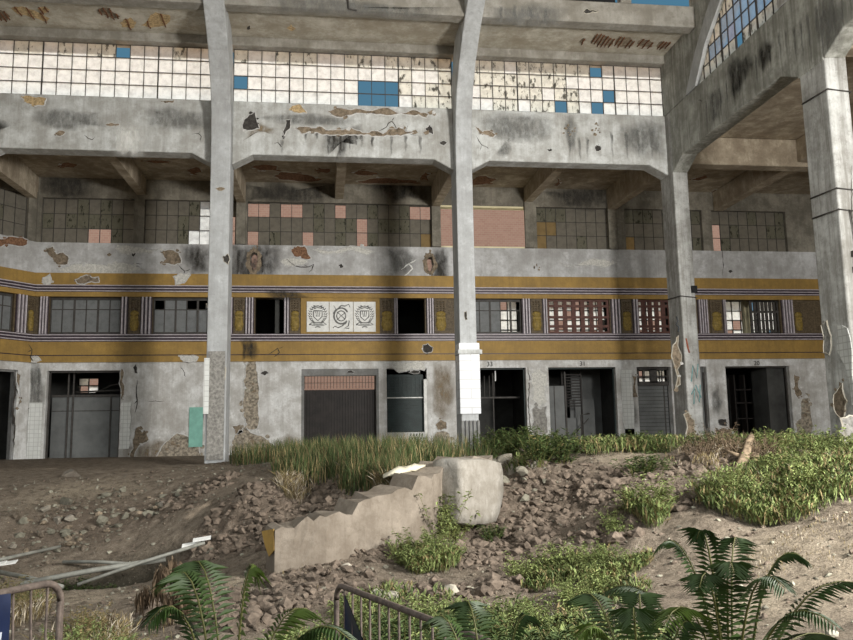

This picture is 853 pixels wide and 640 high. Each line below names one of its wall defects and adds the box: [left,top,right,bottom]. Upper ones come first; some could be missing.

spalling [0,6,50,24]
spalling [580,34,671,50]
leakage [706,0,843,119]
flaking render [282,104,436,139]
flaking render [0,236,28,248]
flaking render [821,320,832,356]
flaking render [671,335,683,392]
flaking render [229,362,276,455]
flaking render [792,374,814,443]
flaking render [830,378,853,445]
flaking render [128,426,150,457]
flaking render [156,431,205,456]